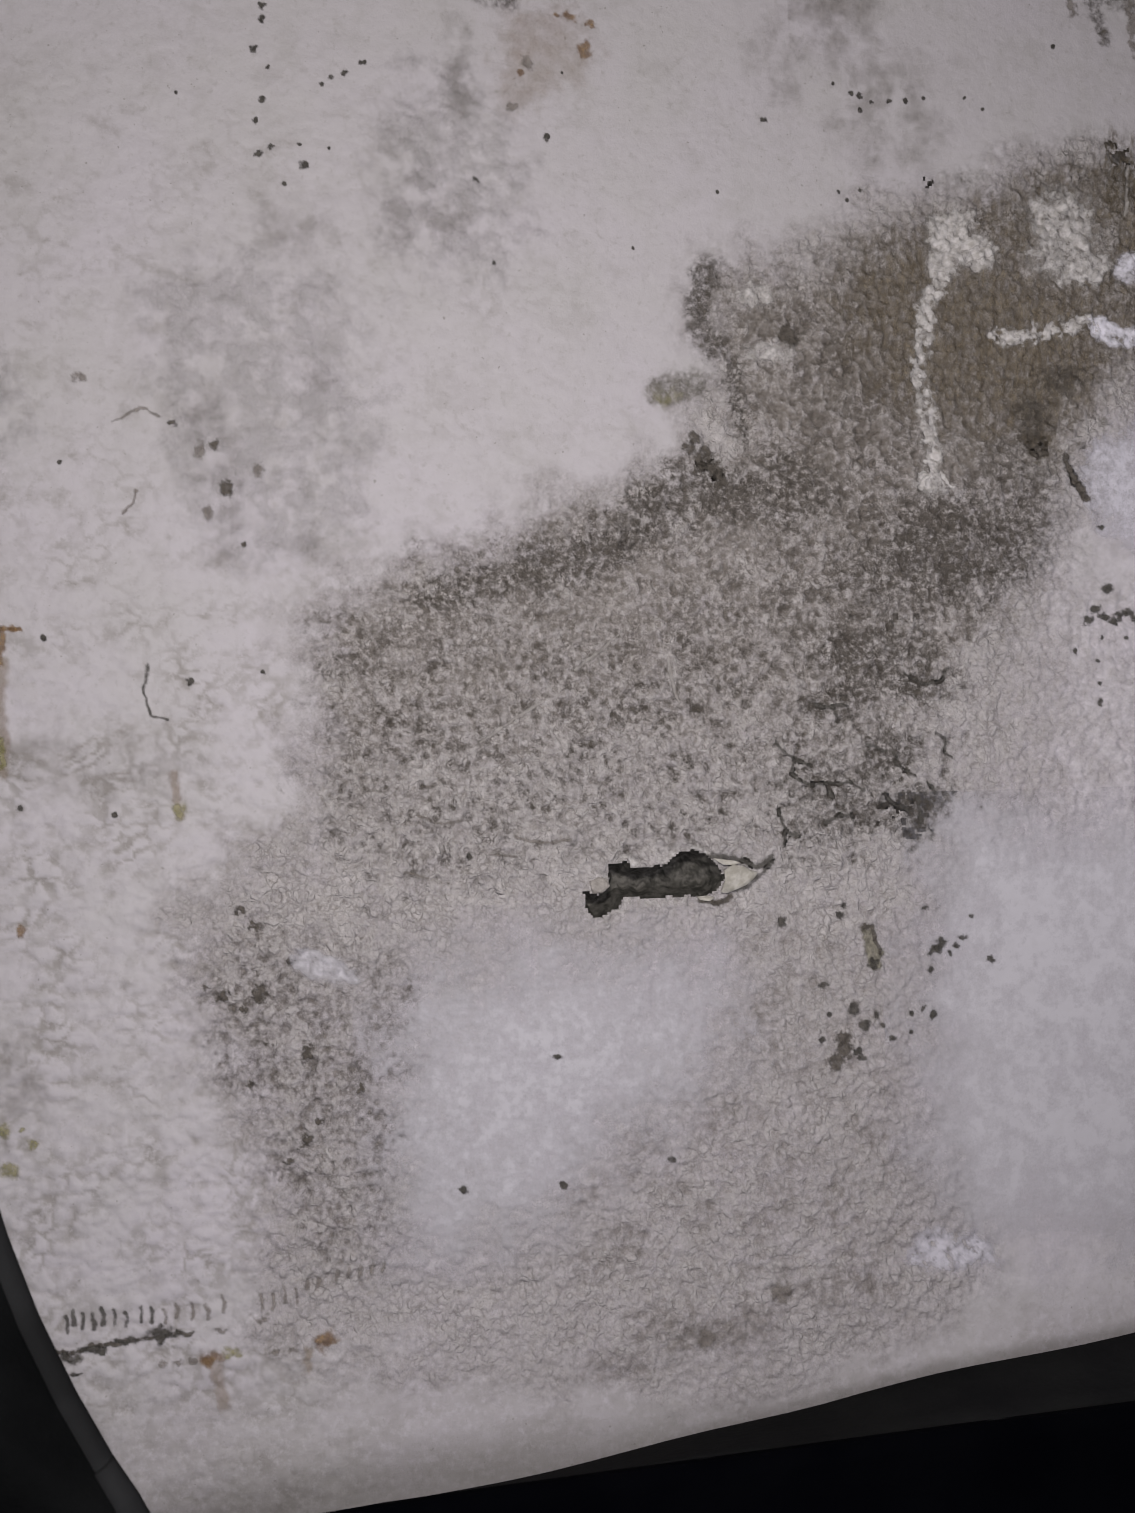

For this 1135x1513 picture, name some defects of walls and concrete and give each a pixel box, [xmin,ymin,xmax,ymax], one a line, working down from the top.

mould [831,81,925,113]
damp [195,441,218,456]
damp [221,480,233,496]
mould [336,157,1135,761]
rust [0,625,21,665]
peeling [157,139,1135,1393]
mould [784,725,922,842]
mould [928,935,967,973]
mould [203,906,383,1186]
mould [819,1002,937,1071]
crack [57,1288,298,1377]